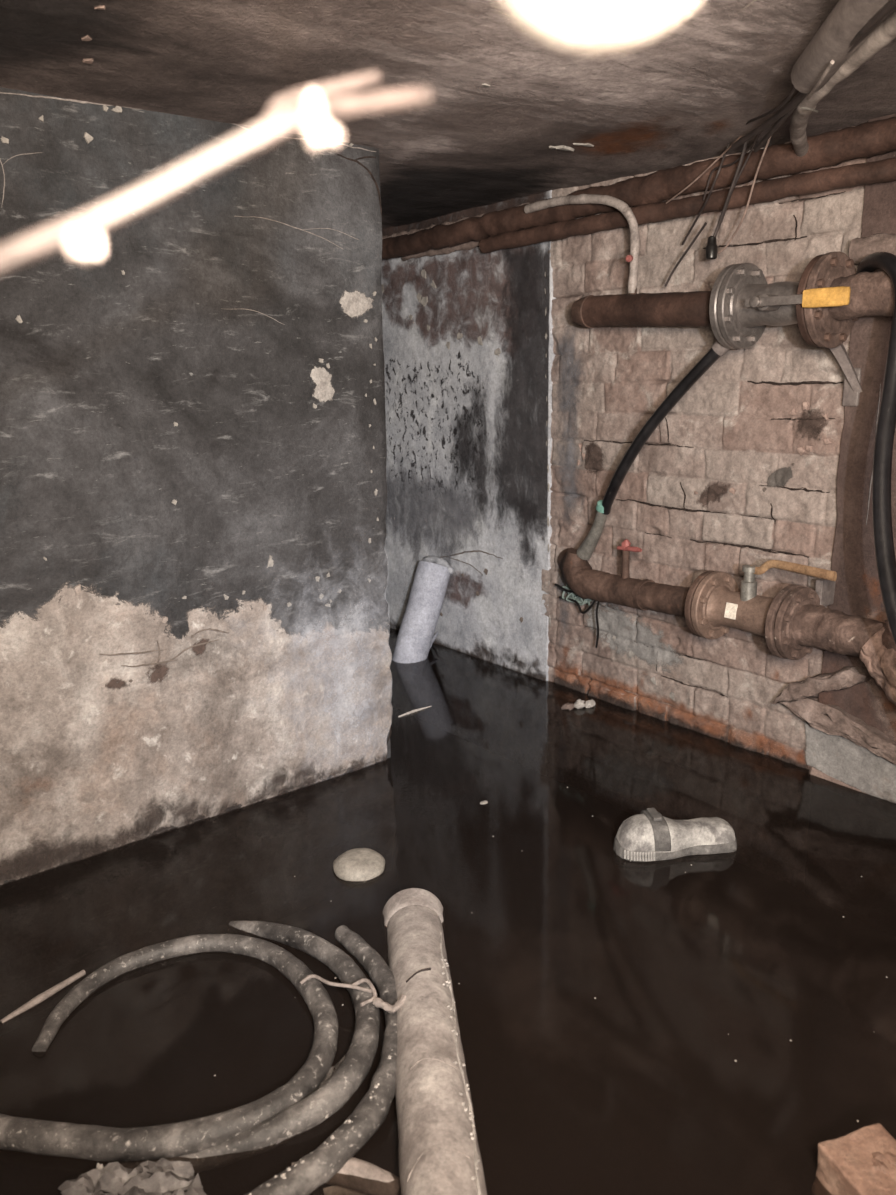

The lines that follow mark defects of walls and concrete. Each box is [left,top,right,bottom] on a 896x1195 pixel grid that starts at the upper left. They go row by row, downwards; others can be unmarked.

spalling [310,358,335,409]
water stain [385,244,550,576]
crack [584,418,693,448]
crack [748,379,843,387]
crack [771,415,835,423]
crack [866,384,881,525]
crack [616,482,830,558]
crack [612,636,727,697]
peeling [0,583,393,885]
rust [556,667,735,742]